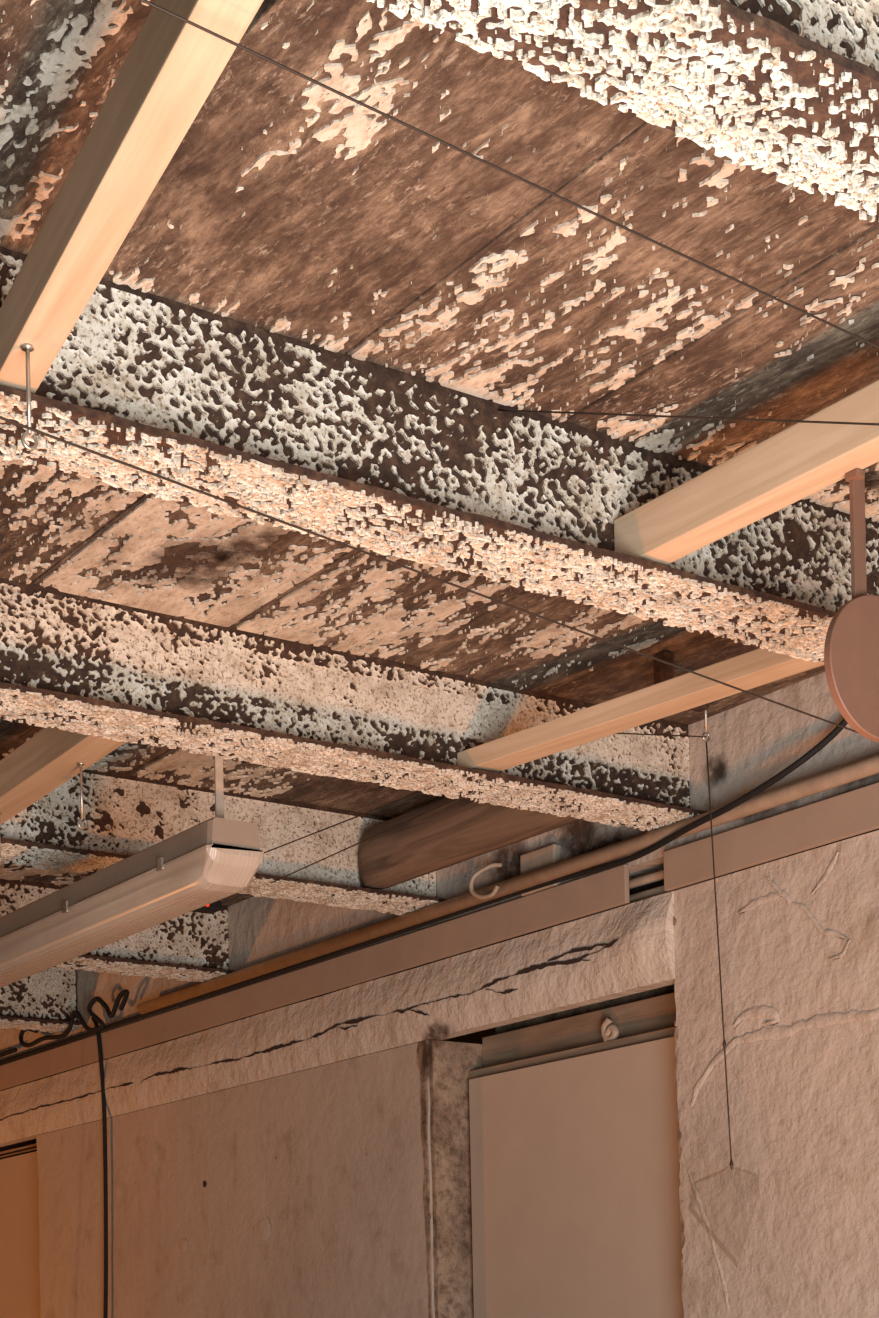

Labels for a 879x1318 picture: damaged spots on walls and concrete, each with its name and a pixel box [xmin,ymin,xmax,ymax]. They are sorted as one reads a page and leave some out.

peeling [0,0,879,917]
damp [148,532,282,585]
crack [738,852,850,961]
peeling [0,910,229,1033]
crack [0,938,620,1121]
damp [422,1027,448,1076]
crack [691,1005,879,1108]